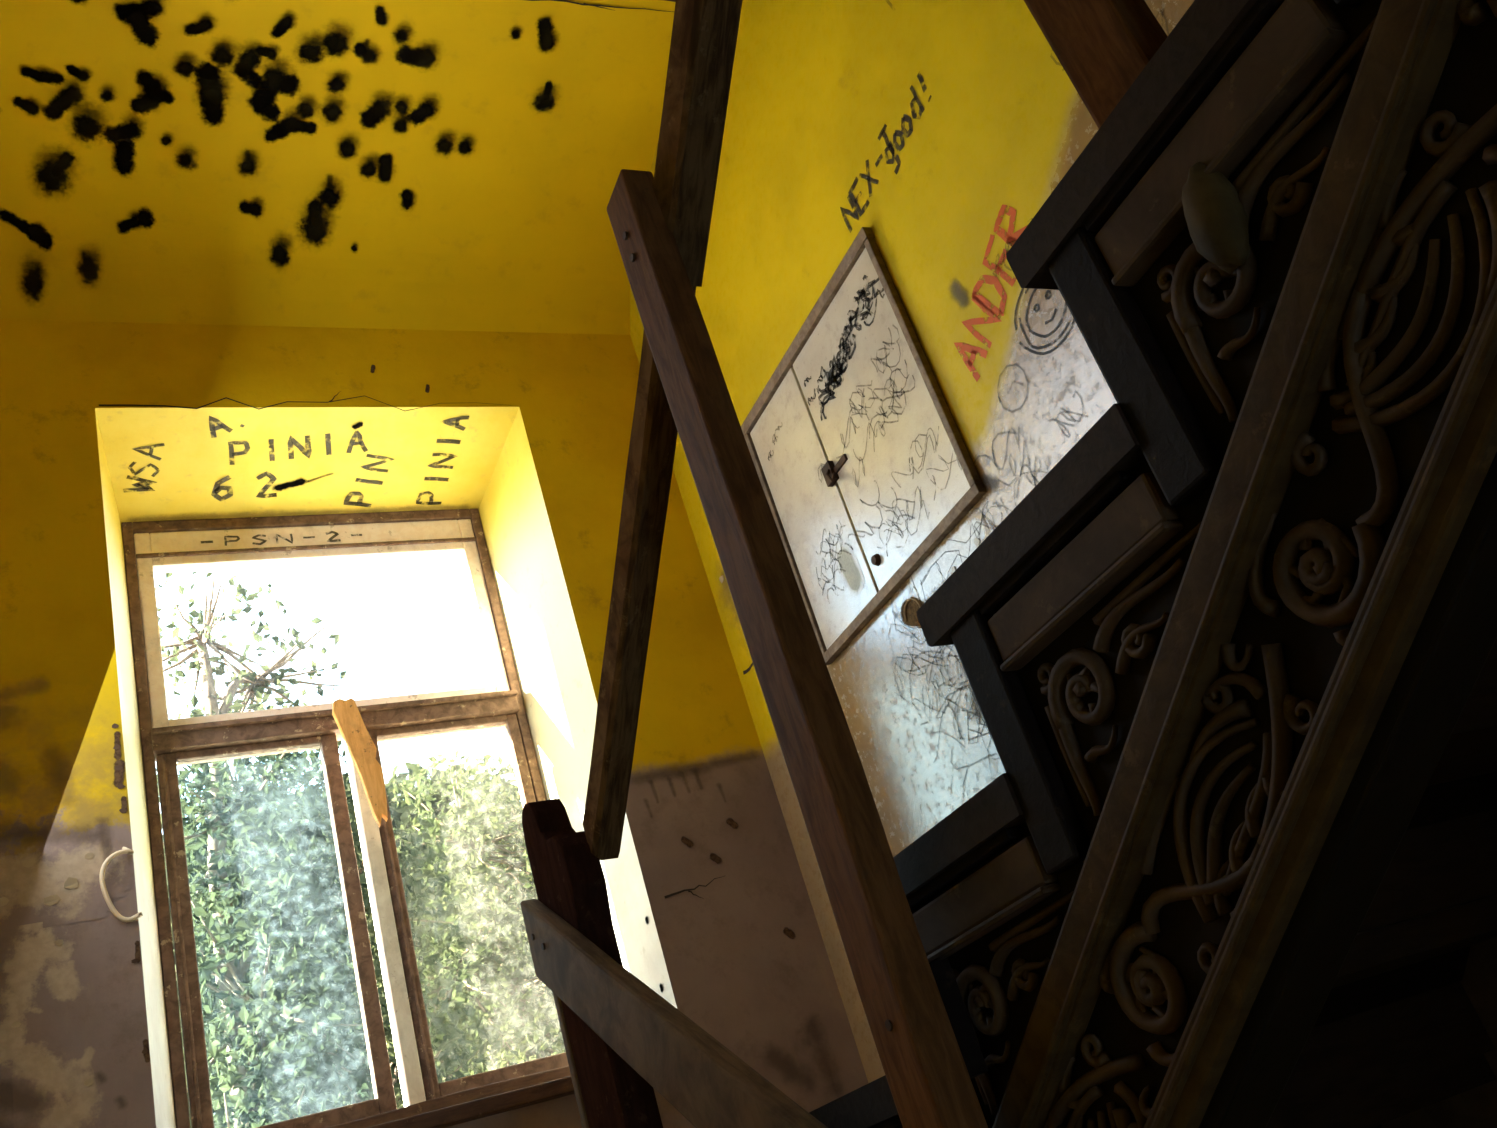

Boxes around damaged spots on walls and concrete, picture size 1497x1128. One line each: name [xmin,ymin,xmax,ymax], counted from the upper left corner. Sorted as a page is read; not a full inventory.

peeling [901,511,989,628]
peeling [0,832,131,1128]
flaking render [131,941,141,963]
flaking render [142,1039,150,1062]